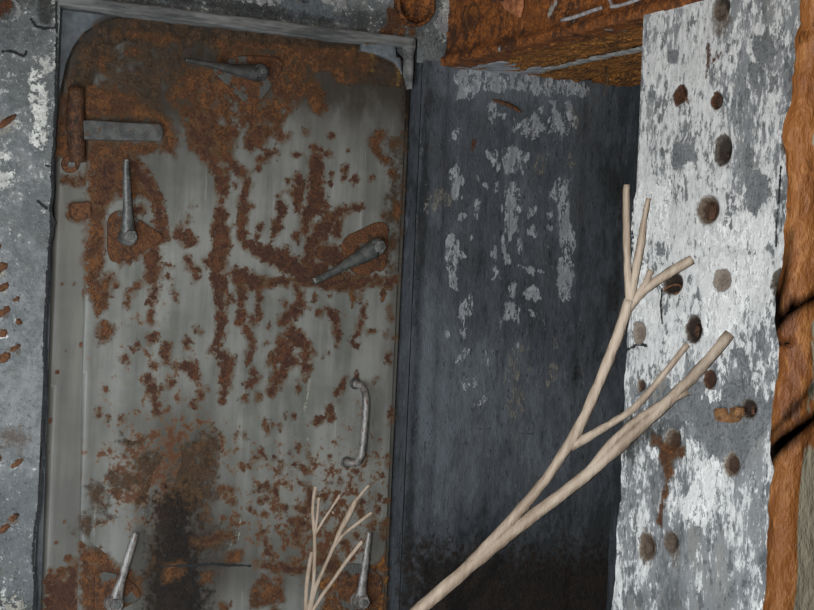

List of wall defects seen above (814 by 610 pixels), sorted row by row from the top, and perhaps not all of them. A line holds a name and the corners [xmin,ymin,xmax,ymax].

peeling [453,69,590,140]
rust [0,262,22,325]
rust [54,18,408,417]
peeling [424,163,465,214]
peeling [445,233,467,291]
peeling [455,294,474,363]
peeling [476,144,551,324]
peeling [547,155,576,301]
rust [313,369,359,427]
rust [39,422,243,610]
rust [241,443,347,610]
rust [652,433,685,562]